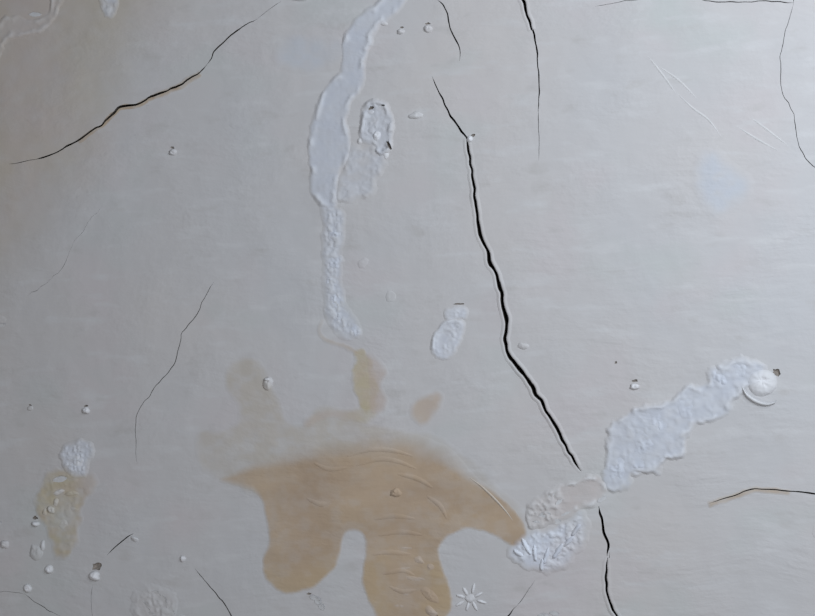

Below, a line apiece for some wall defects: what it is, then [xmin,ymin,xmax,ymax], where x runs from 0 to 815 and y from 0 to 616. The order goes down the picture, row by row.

crack [13,3,278,164]
peeling [357,97,395,159]
crack [517,0,540,133]
crack [704,0,814,167]
crack [135,282,214,438]
leakage [194,0,592,616]
crack [432,77,584,473]
leakage [32,437,100,561]
crack [196,570,232,616]
crack [599,508,622,616]
crack [711,488,815,503]